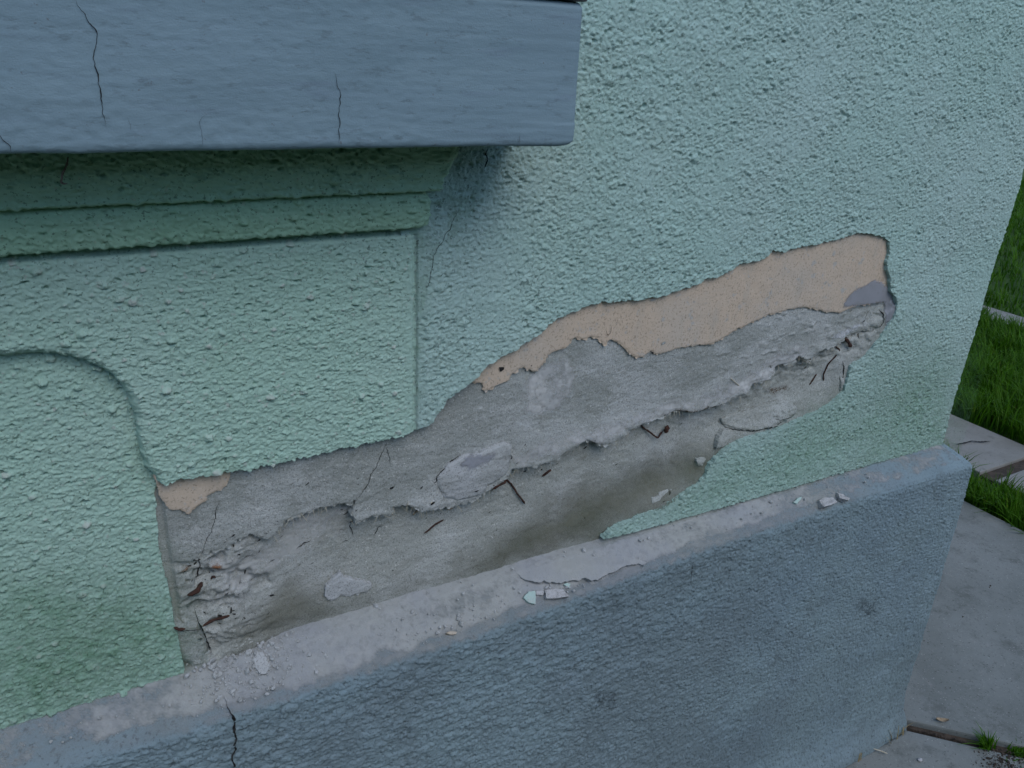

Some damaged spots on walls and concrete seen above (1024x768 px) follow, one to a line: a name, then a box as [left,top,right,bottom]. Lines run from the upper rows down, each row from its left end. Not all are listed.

crack [76,2,131,129]
crack [340,447,391,541]
flaking render [153,233,888,668]
crack [186,608,211,657]
crack [226,704,237,767]